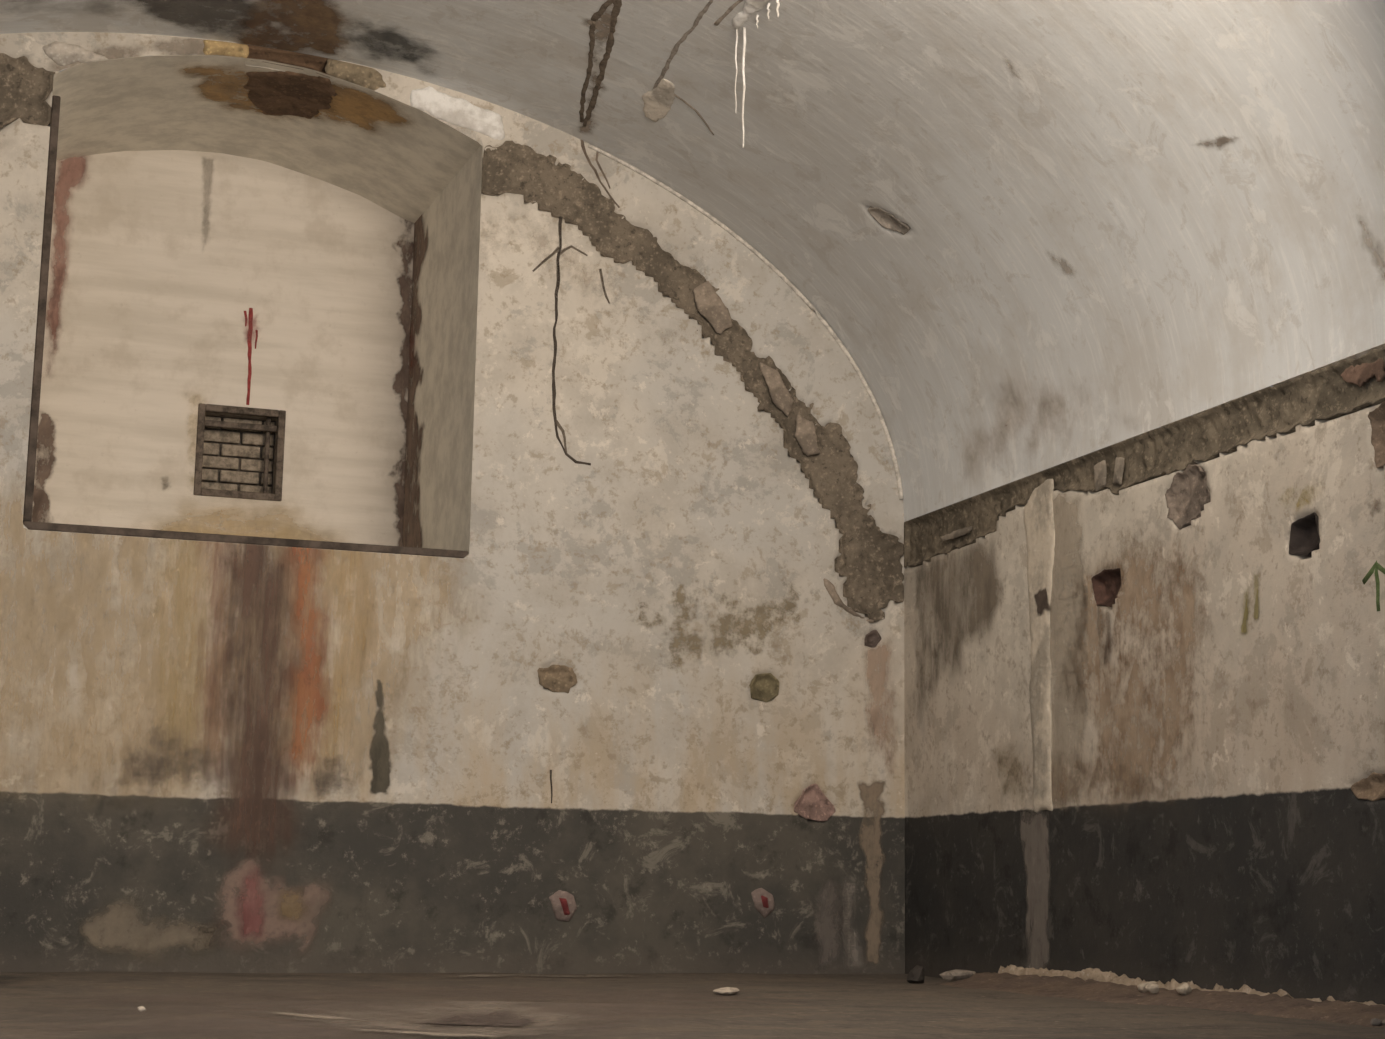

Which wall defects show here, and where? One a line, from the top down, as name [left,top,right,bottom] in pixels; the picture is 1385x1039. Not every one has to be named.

spalling [0,41,109,129]
damp [353,27,430,62]
crack [579,0,622,208]
crack [642,0,743,135]
peeling [46,156,86,350]
spalling [481,141,1385,648]
damp [0,502,447,793]
rust [169,542,342,858]
damp [917,547,999,688]
damp [1051,550,1195,799]
peeling [81,859,331,956]
damp [1020,810,1050,969]